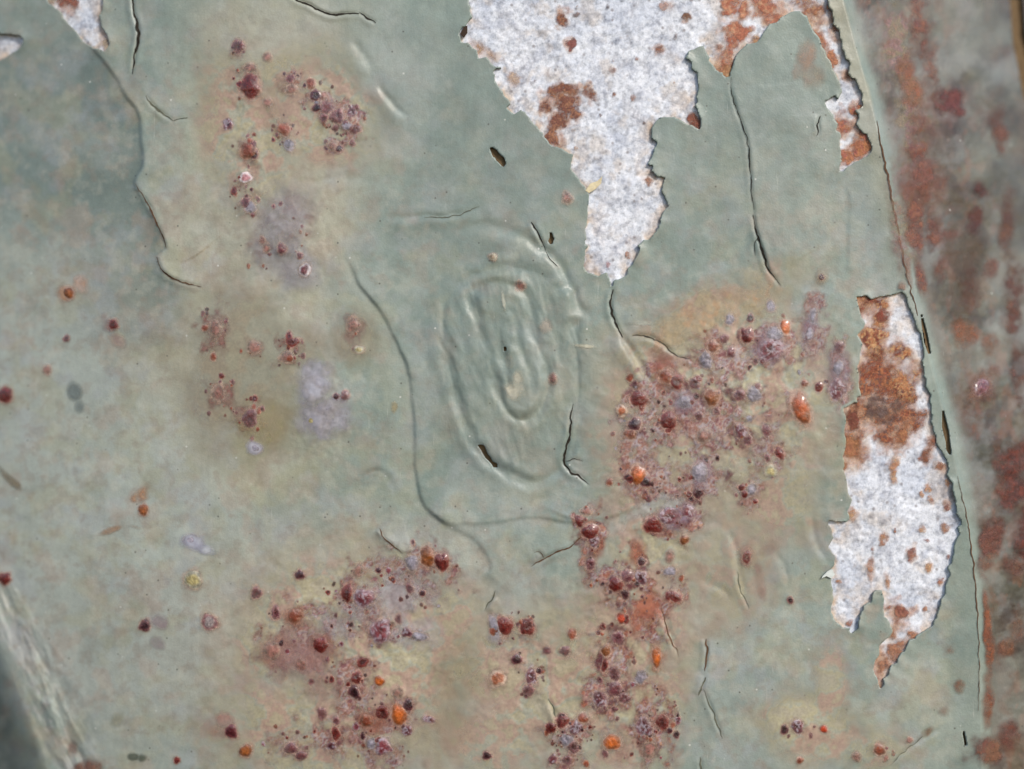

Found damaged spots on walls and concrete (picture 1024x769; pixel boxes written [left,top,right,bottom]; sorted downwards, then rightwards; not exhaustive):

peeling [48,0,110,51]
crack [132,0,140,74]
crack [296,0,376,23]
rust [205,39,367,279]
peeling [459,0,872,286]
crack [731,89,781,286]
crack [877,122,918,315]
rust [195,299,306,453]
rust [224,272,854,769]
crack [563,407,587,483]
peeling [822,292,961,688]
rust [765,652,895,764]